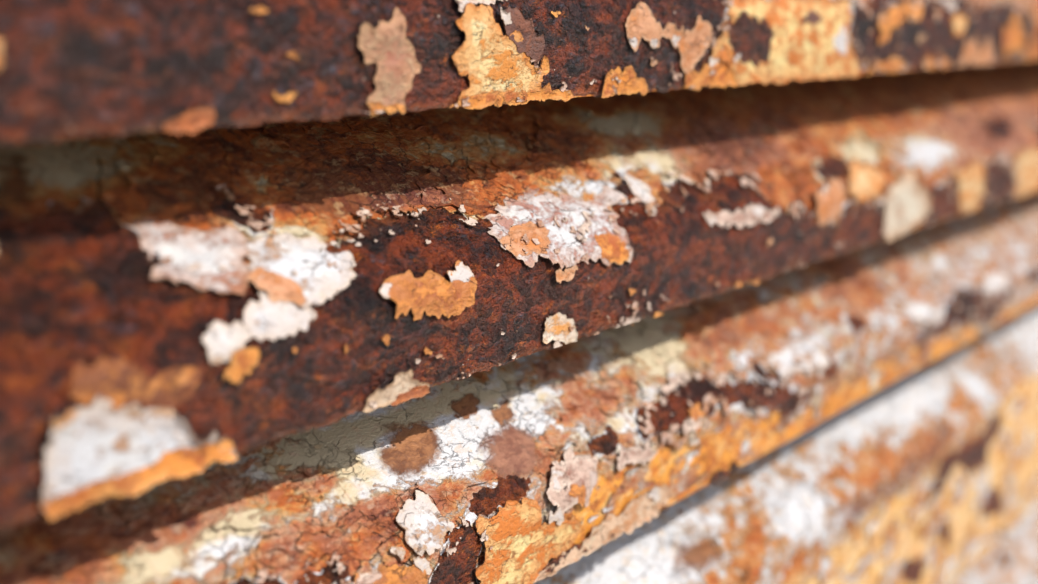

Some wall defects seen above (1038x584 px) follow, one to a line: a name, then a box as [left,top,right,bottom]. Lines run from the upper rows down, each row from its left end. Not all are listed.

rust [0,0,774,145]
peeling [449,0,574,110]
peeling [624,0,861,91]
rust [848,0,1038,76]
peeling [484,175,657,284]
rust [909,117,1019,231]
peeling [40,217,361,520]
peeling [378,260,477,321]
rust [0,166,890,528]
rust [542,265,1038,584]
rust [428,400,540,584]
peeling [475,484,670,584]